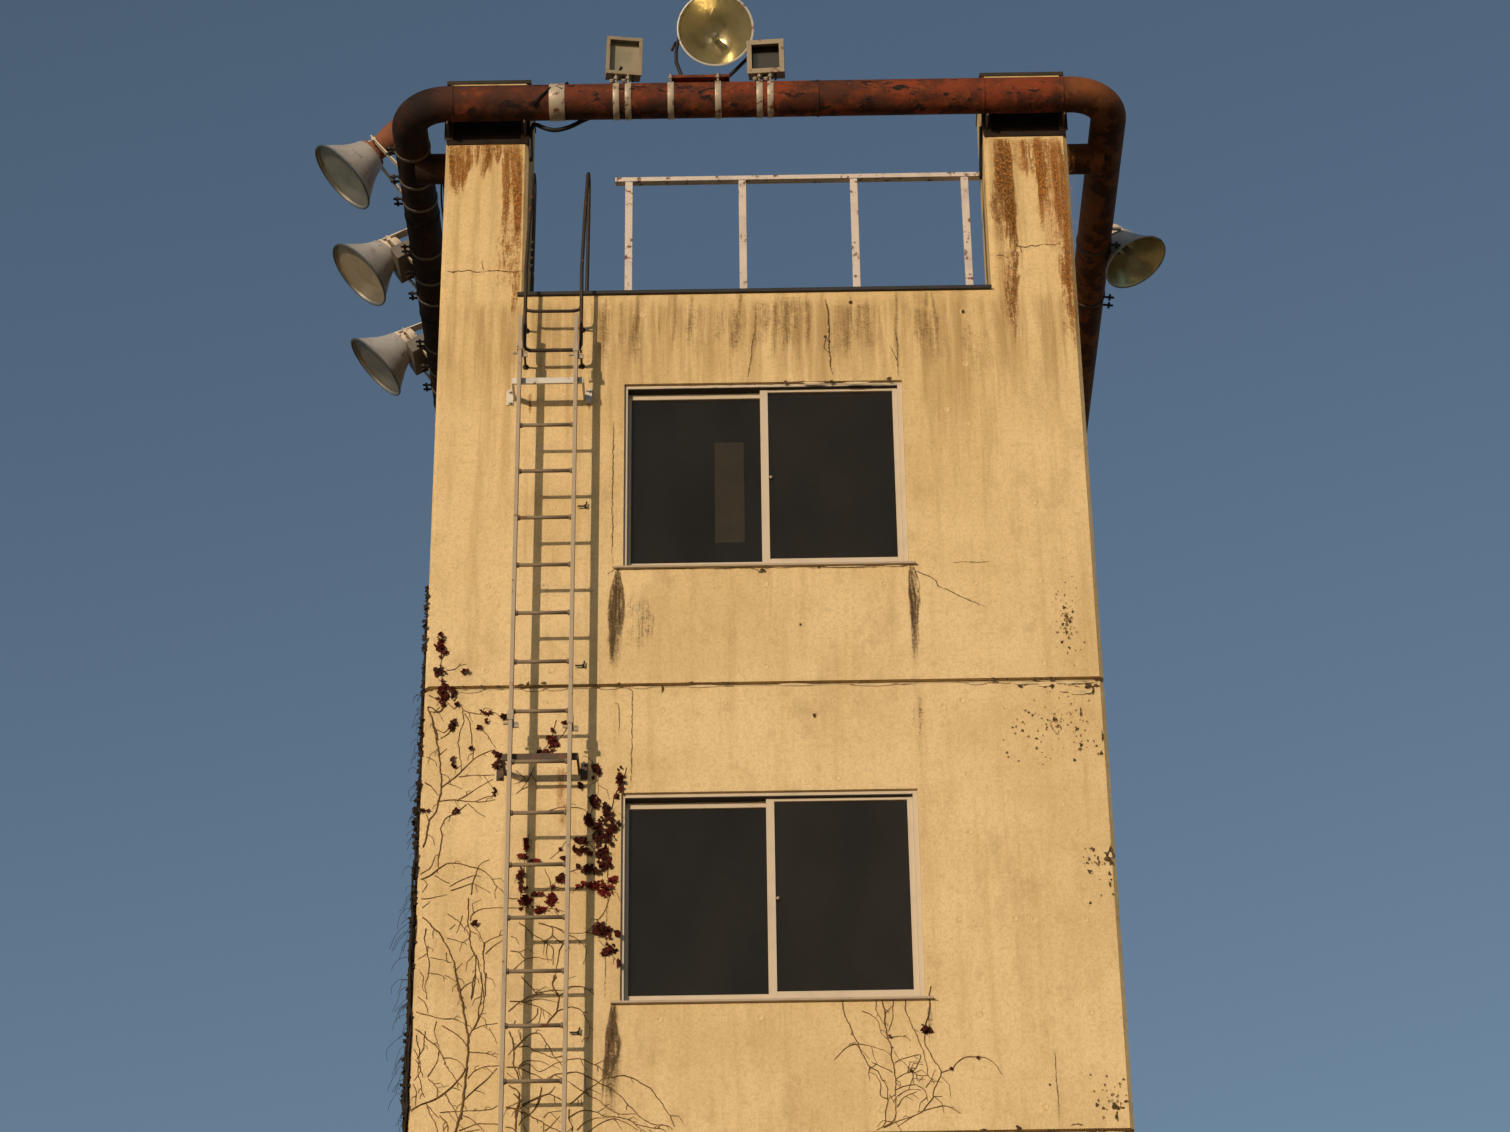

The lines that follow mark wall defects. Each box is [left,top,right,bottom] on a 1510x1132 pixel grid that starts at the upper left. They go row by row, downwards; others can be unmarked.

water stain [608,576,625,657]
water stain [908,567,919,649]
crack [917,561,986,606]